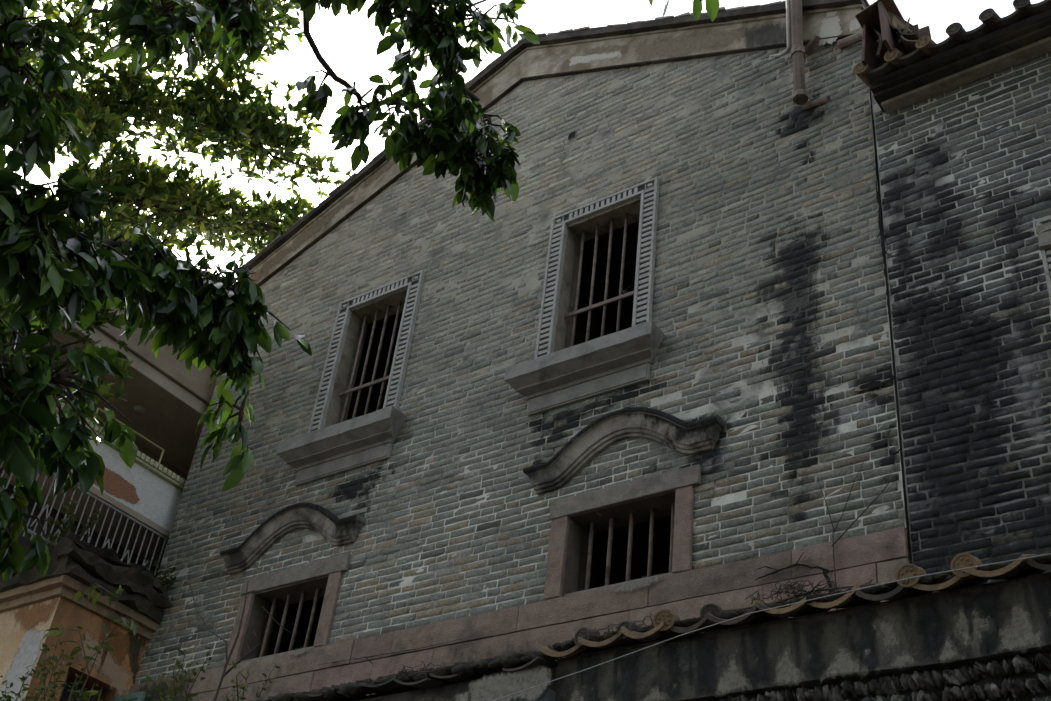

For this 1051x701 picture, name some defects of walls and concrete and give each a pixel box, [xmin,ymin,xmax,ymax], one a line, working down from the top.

damp [841,137,1051,575]
flaking render [94,467,140,504]
flaking render [415,667,551,701]
damp [658,637,716,698]
damp [846,609,878,670]
damp [963,580,1004,656]